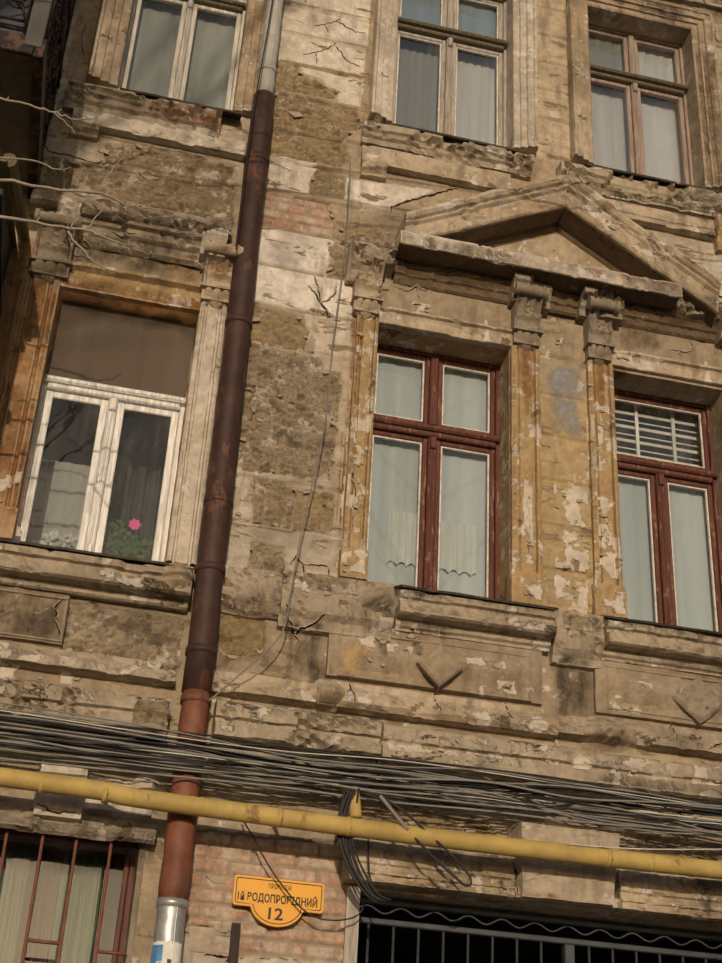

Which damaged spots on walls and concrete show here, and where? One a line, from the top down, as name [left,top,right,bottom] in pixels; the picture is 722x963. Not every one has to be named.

flaking render [40,144,239,244]
flaking render [261,64,393,277]
flaking render [234,306,373,533]
peeling [586,392,611,472]
flaking render [244,545,285,573]
flaking render [303,533,366,595]
peeling [523,477,534,564]
peeling [520,577,542,600]
peeling [553,484,626,632]